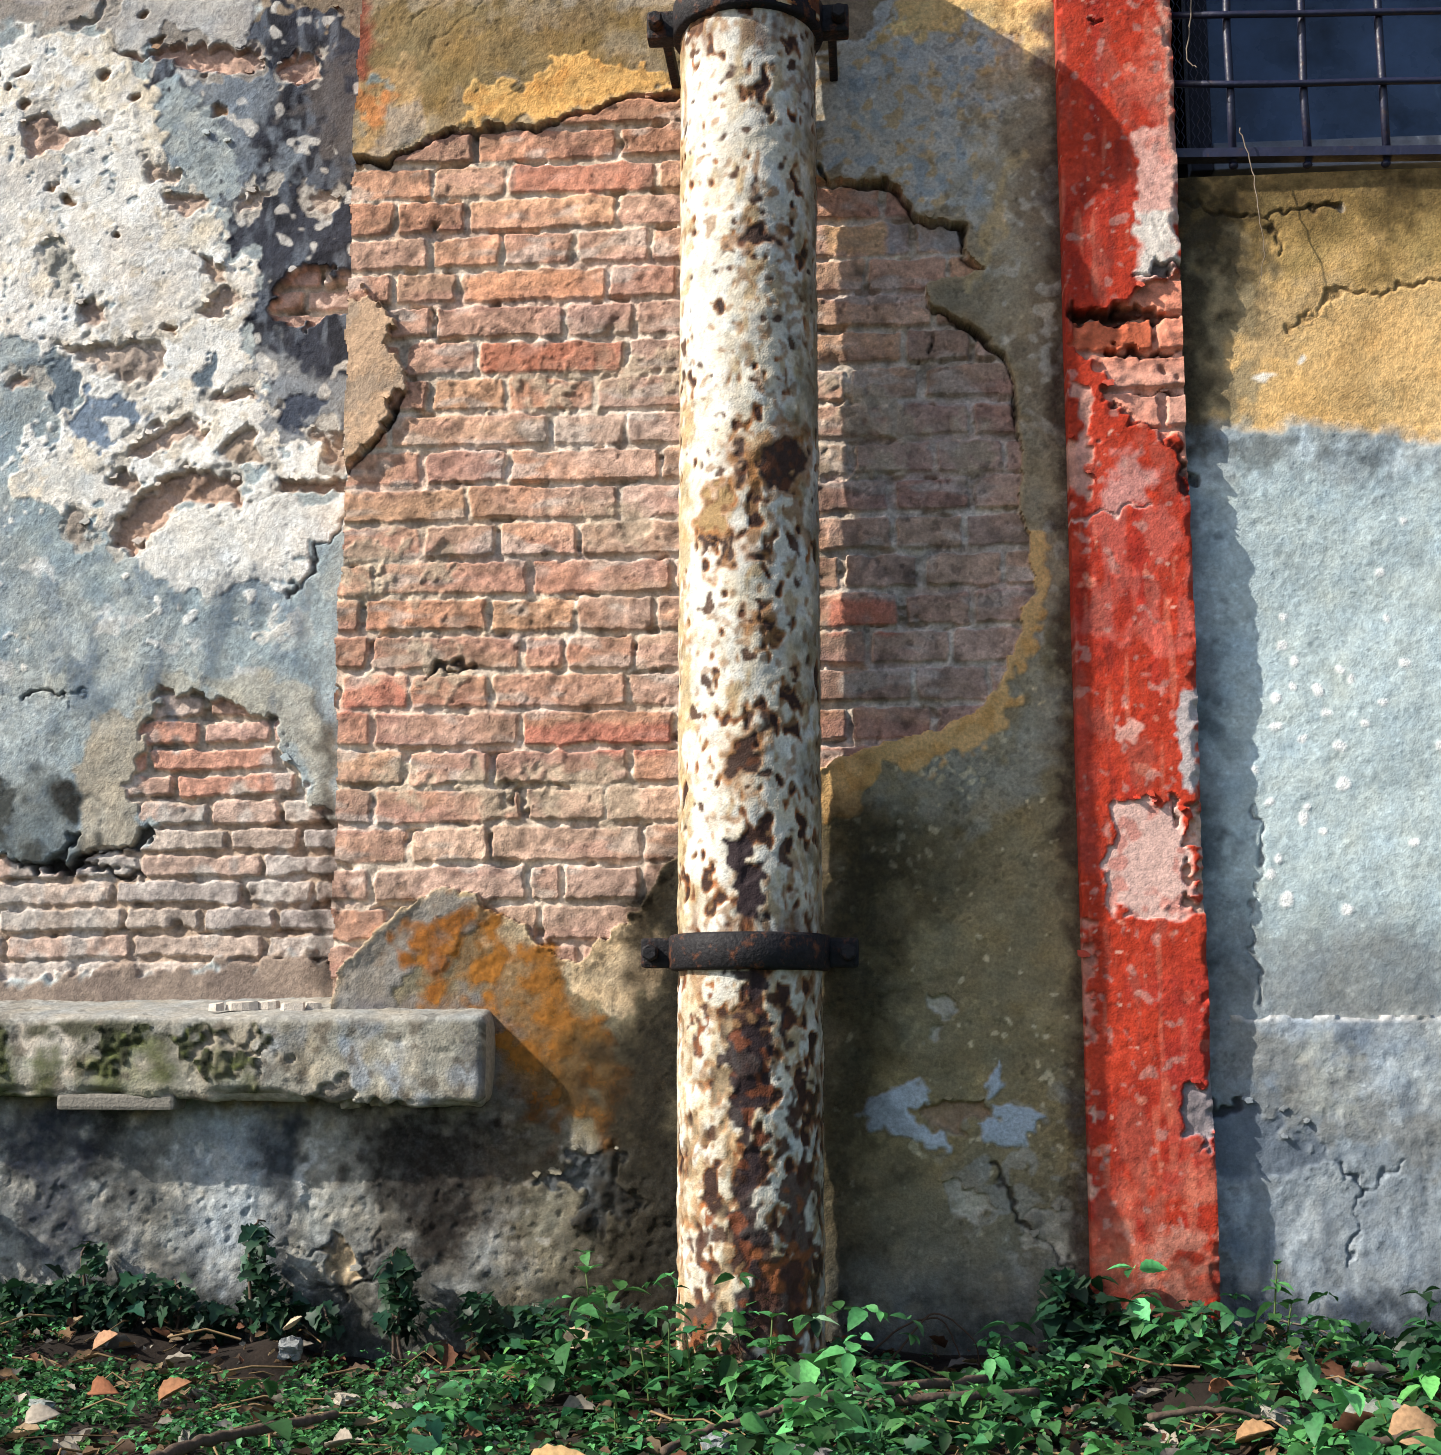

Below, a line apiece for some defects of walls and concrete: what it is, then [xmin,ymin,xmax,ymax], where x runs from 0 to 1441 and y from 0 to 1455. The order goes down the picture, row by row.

crack [1268,200,1345,243]
crack [1320,285,1351,307]
flaking render [1067,270,1188,501]
flaking render [0,0,681,1011]
rust [695,434,808,565]
flaking render [815,174,1037,767]
rust [723,833,772,922]
water stain [80,1110,173,1216]
water stain [367,1102,557,1266]
rust [684,1005,824,1375]
crack [1212,1096,1244,1118]
water stain [0,1275,497,1362]